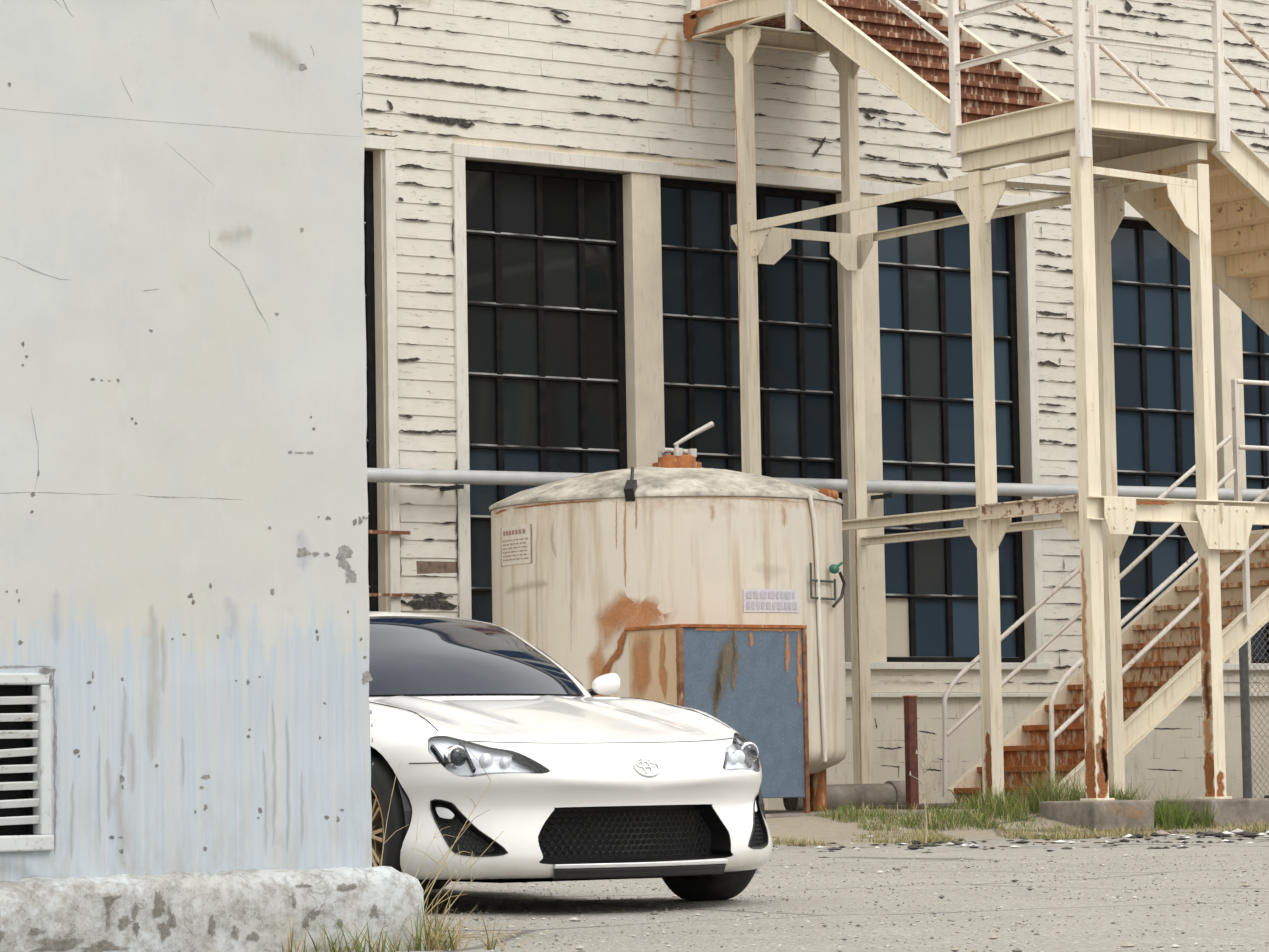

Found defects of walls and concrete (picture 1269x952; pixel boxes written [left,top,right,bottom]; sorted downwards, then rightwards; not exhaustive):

peeling [370,4,431,29]
peeling [366,57,528,91]
peeling [364,100,572,201]
spalling [572,72,700,122]
peeling [858,93,951,185]
spalling [963,0,1269,150]
crack [209,230,270,332]
spalling [1006,175,1078,477]
spalling [410,459,459,576]
corrosion [591,500,666,679]
corrosion [1081,550,1109,798]
corrosion [1200,558,1224,797]